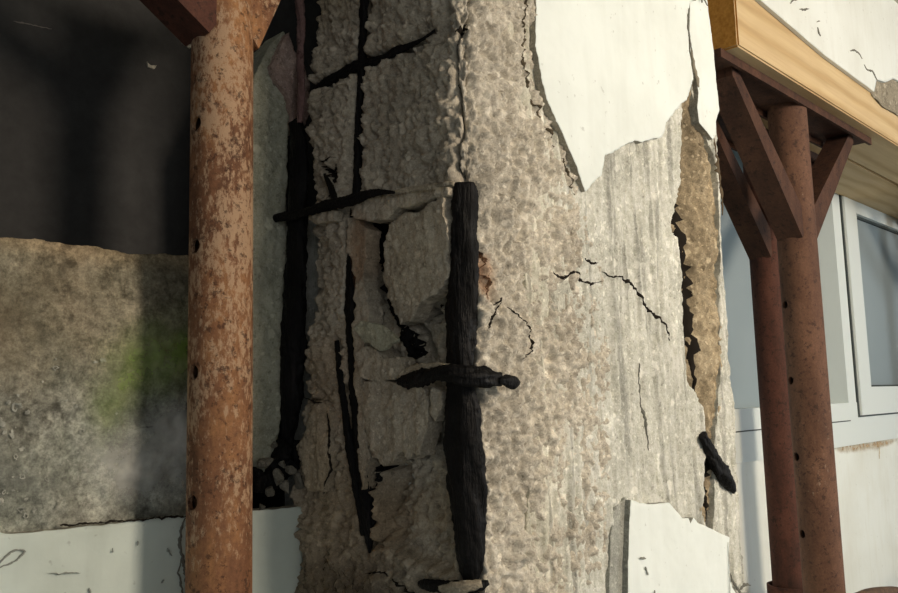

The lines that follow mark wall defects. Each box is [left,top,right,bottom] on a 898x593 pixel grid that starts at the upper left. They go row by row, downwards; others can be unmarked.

spalling [253,0,627,593]
crack [553,0,724,522]
spalling [871,79,898,116]